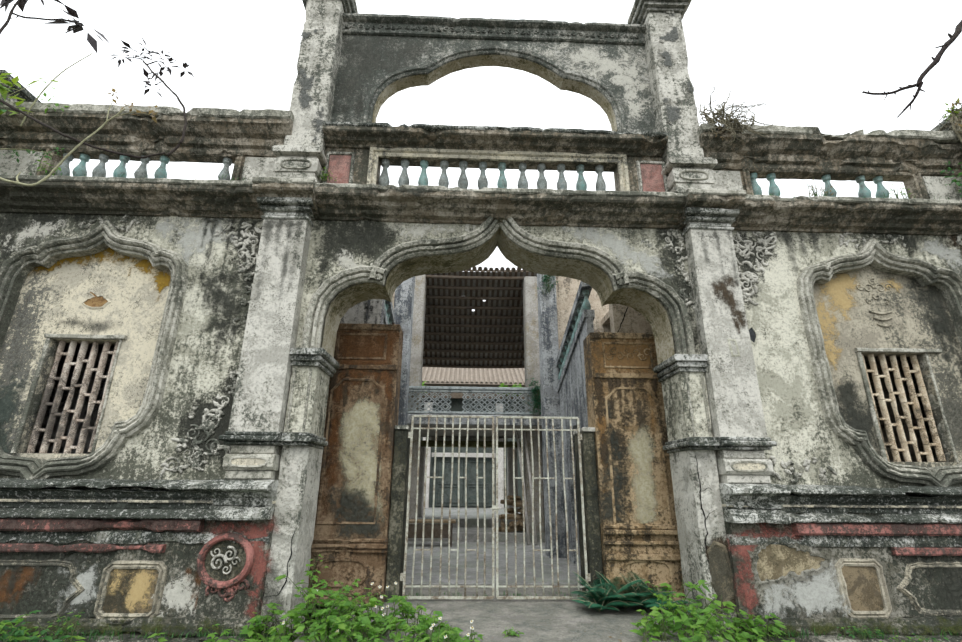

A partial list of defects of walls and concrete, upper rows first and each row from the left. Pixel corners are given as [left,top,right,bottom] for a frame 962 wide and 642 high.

damp [0,213,96,267]
damp [32,247,171,301]
peeling [712,276,758,357]
peeling [816,273,860,370]
damp [834,379,886,454]
crack [695,456,715,563]
crack [265,531,295,597]
flaking render [707,523,831,616]